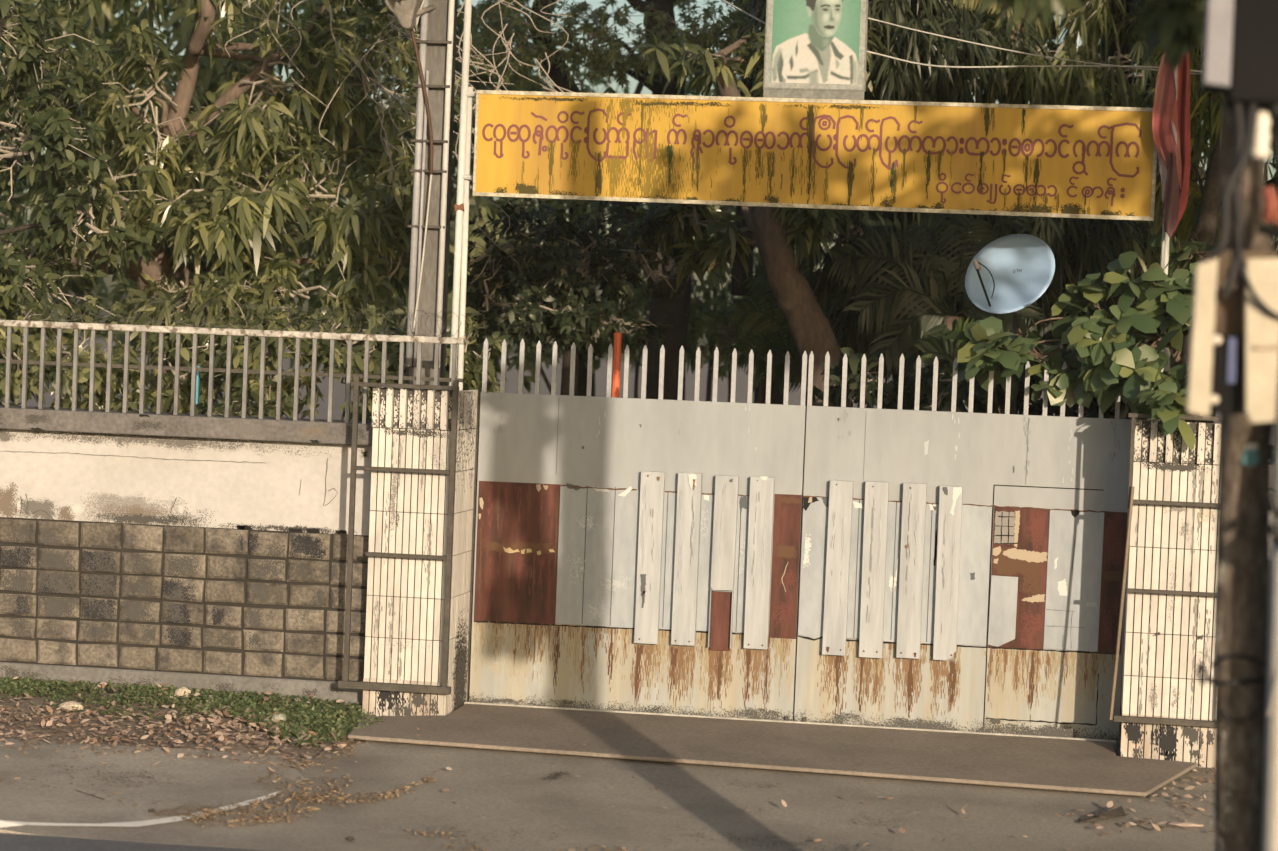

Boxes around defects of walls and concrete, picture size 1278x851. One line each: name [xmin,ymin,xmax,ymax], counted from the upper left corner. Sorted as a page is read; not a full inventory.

leakage [0,497,357,653]
leakage [0,387,476,565]
leakage [422,519,433,588]